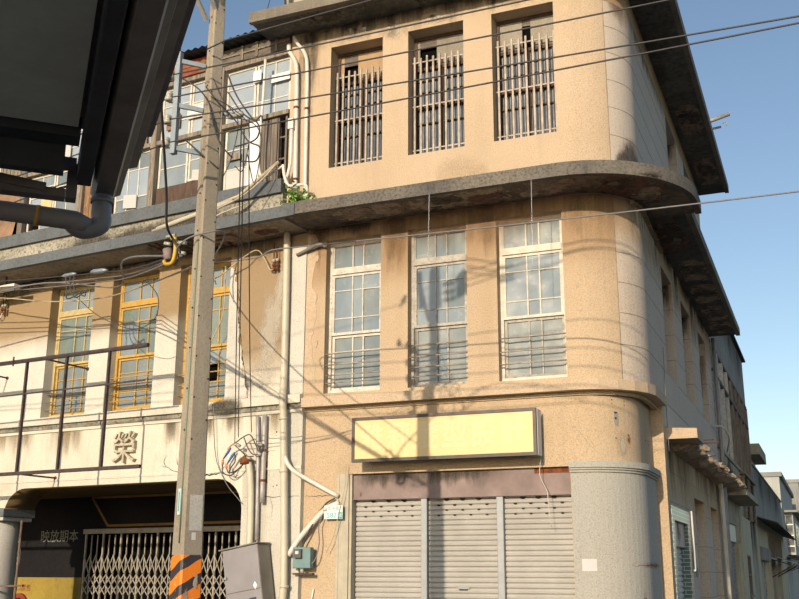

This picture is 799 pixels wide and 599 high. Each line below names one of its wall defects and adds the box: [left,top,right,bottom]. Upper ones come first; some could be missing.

peeling [224,267,248,400]
peeling [304,234,319,384]
water stain [208,400,238,421]